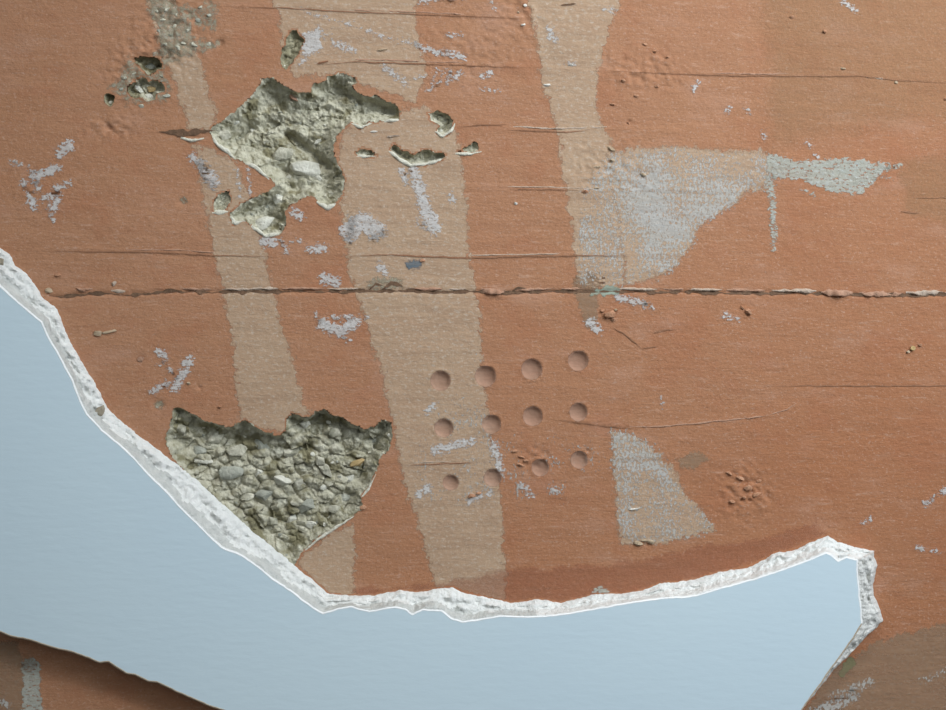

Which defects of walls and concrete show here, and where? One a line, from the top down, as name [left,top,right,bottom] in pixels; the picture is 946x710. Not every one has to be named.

peeling [280,30,304,69]
spalling [127,56,165,102]
spalling [104,93,115,107]
peeling [428,110,455,138]
spalling [210,72,402,238]
peeling [389,142,481,167]
crack [53,249,257,257]
crack [364,252,605,260]
crack [54,281,946,298]
spalling [0,248,883,710]